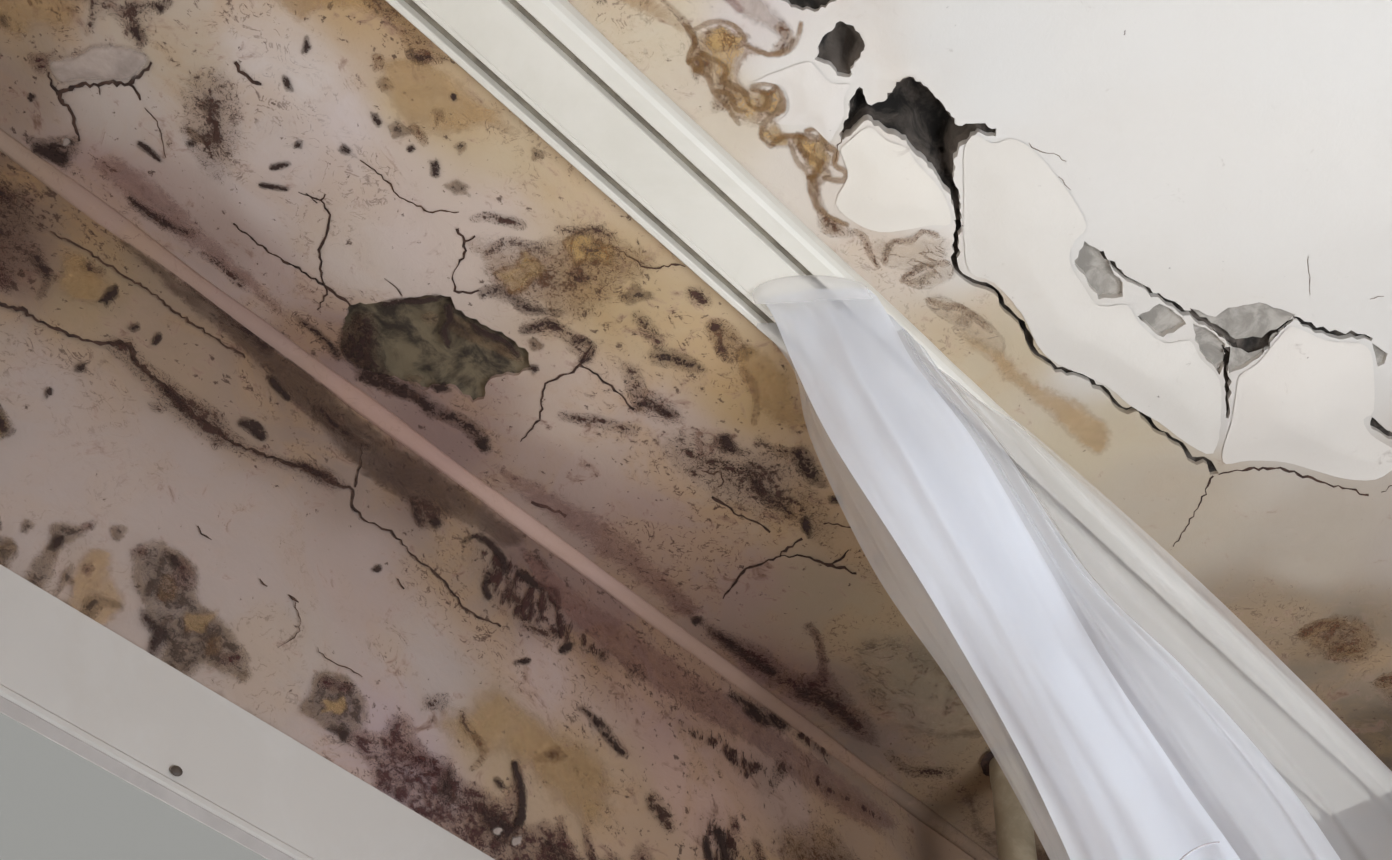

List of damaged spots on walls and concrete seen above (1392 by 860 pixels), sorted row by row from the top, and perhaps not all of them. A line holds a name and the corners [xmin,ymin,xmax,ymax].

hole [789,0,830,9]
crack [48,62,166,158]
damp [661,0,852,237]
hole [817,21,996,219]
crack [0,302,501,627]
crack [233,192,351,310]
damp [108,243,610,681]
flaking render [341,295,531,400]
damp [296,212,840,549]
crack [951,214,1392,547]
flaking render [1139,302,1295,370]
damp [302,672,655,860]